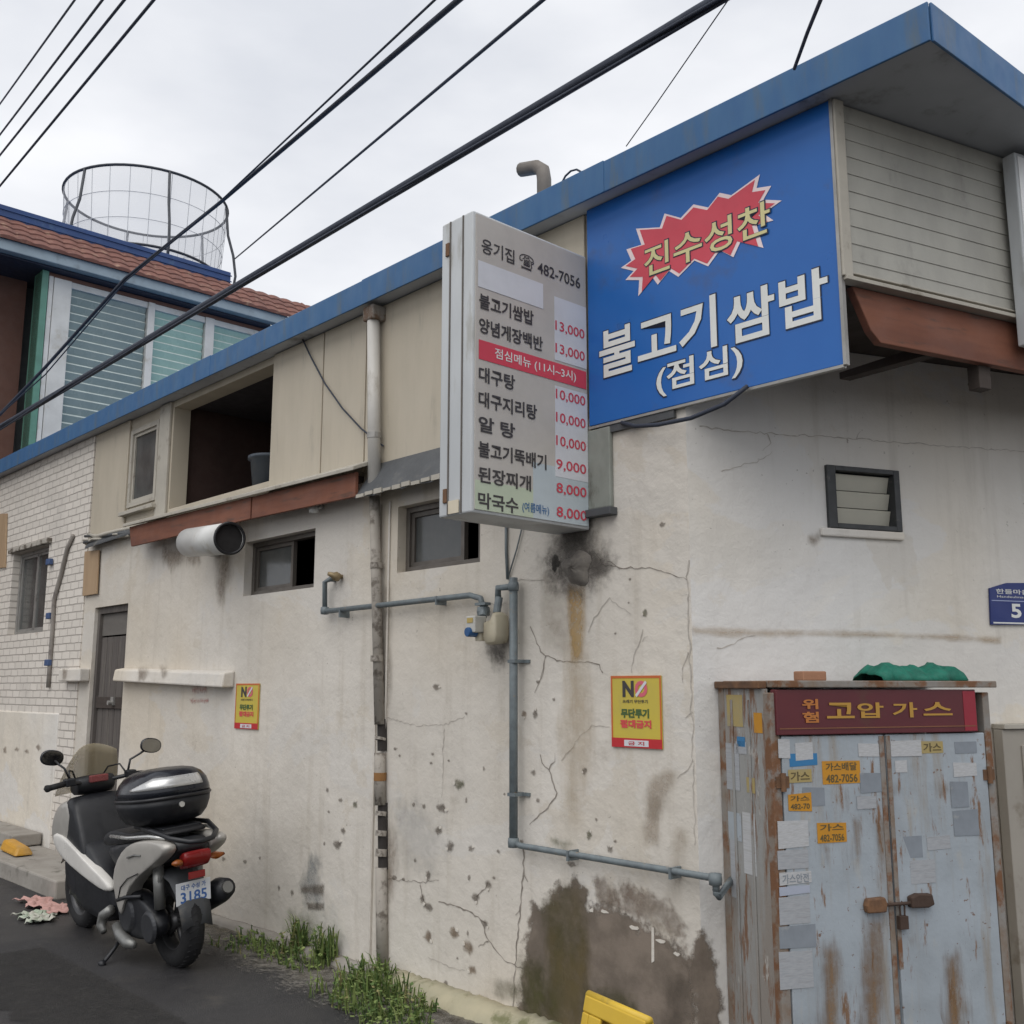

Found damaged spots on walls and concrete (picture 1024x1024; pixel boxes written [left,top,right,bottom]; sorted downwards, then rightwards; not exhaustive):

crack [530,626,603,693]
corrosion [569,588,582,658]
crack [588,597,647,673]
crack [598,557,696,845]
crack [530,725,605,824]
crack [388,849,528,1004]
water stain [595,879,684,934]
corrosion [826,951,836,1024]
corrosion [865,927,881,1024]
corrosion [948,960,960,1024]